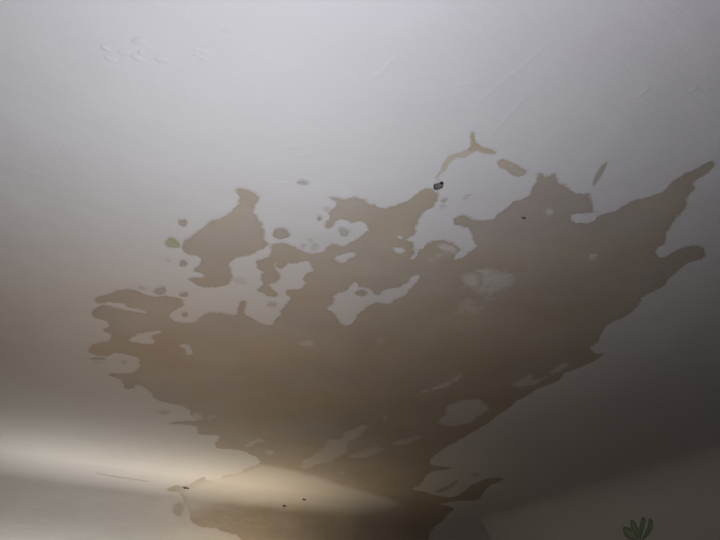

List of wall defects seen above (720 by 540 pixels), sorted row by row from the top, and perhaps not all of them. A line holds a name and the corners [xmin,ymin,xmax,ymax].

leakage [87,158,716,540]